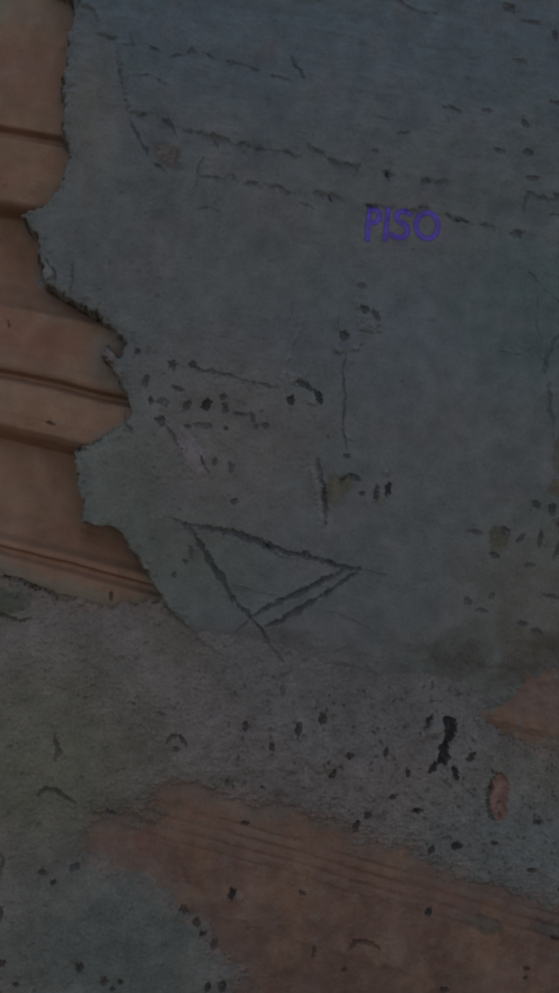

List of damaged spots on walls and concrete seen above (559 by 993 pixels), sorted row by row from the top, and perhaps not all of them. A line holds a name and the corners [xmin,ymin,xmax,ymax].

crack [117,31,496,230]
crack [521,191,559,217]
spalling [141,374,270,431]
spalling [484,770,510,822]